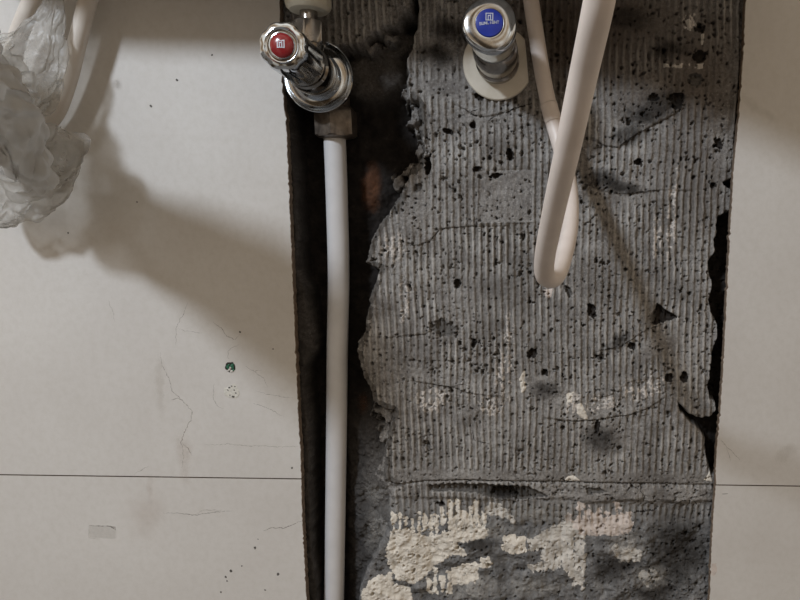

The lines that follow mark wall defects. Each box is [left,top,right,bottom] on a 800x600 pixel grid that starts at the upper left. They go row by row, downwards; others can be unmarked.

spalling [357,91,432,487]
spalling [587,303,597,319]
spalling [665,371,688,383]
peeling [566,392,600,434]
spalling [390,482,547,536]
peeling [564,487,632,524]
peeling [431,561,479,595]
peeling [638,568,659,587]